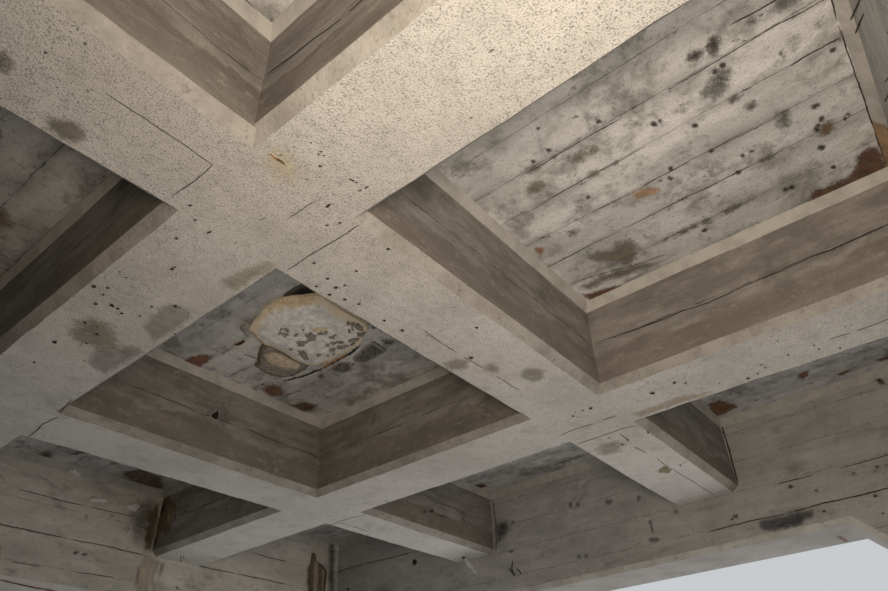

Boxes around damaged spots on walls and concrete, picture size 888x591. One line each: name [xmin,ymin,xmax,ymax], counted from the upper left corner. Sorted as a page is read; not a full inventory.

crack [268,0,362,74]
mould [692,38,737,103]
crack [107,94,212,196]
corrosion [810,123,888,200]
leakage [72,320,140,373]
corrosion [184,355,210,367]
corrosion [708,400,738,417]
leakage [761,510,825,531]